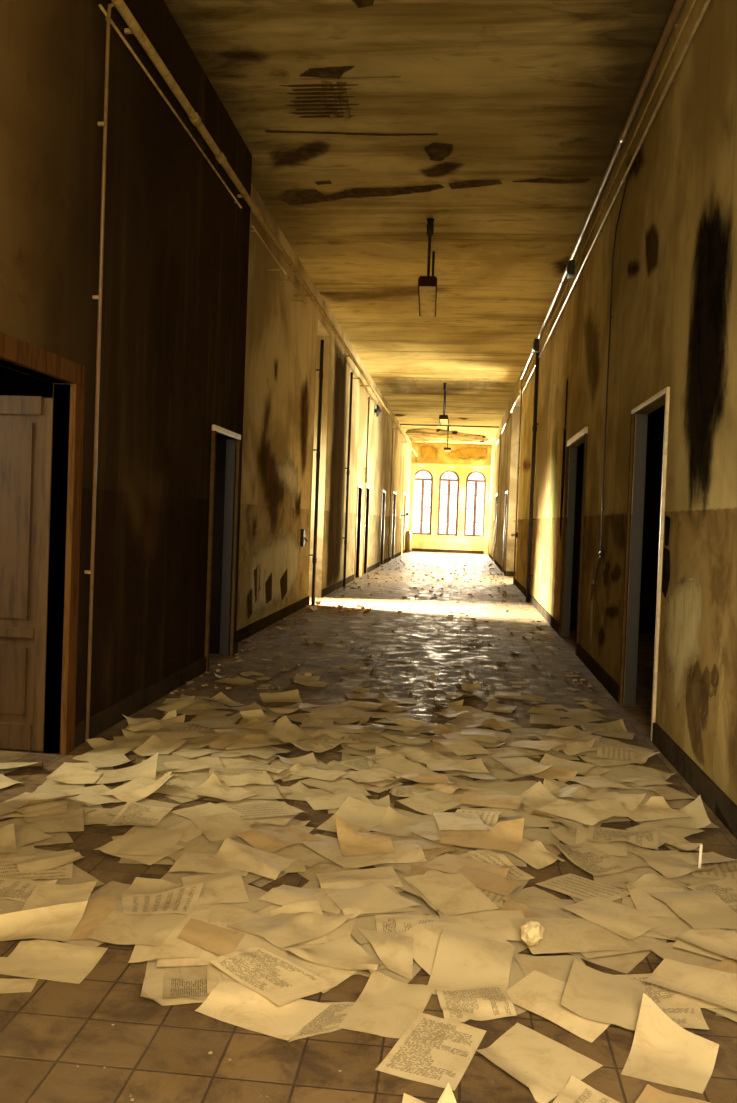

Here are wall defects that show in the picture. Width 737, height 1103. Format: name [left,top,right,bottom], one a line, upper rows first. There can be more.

damp [684,202,732,508]